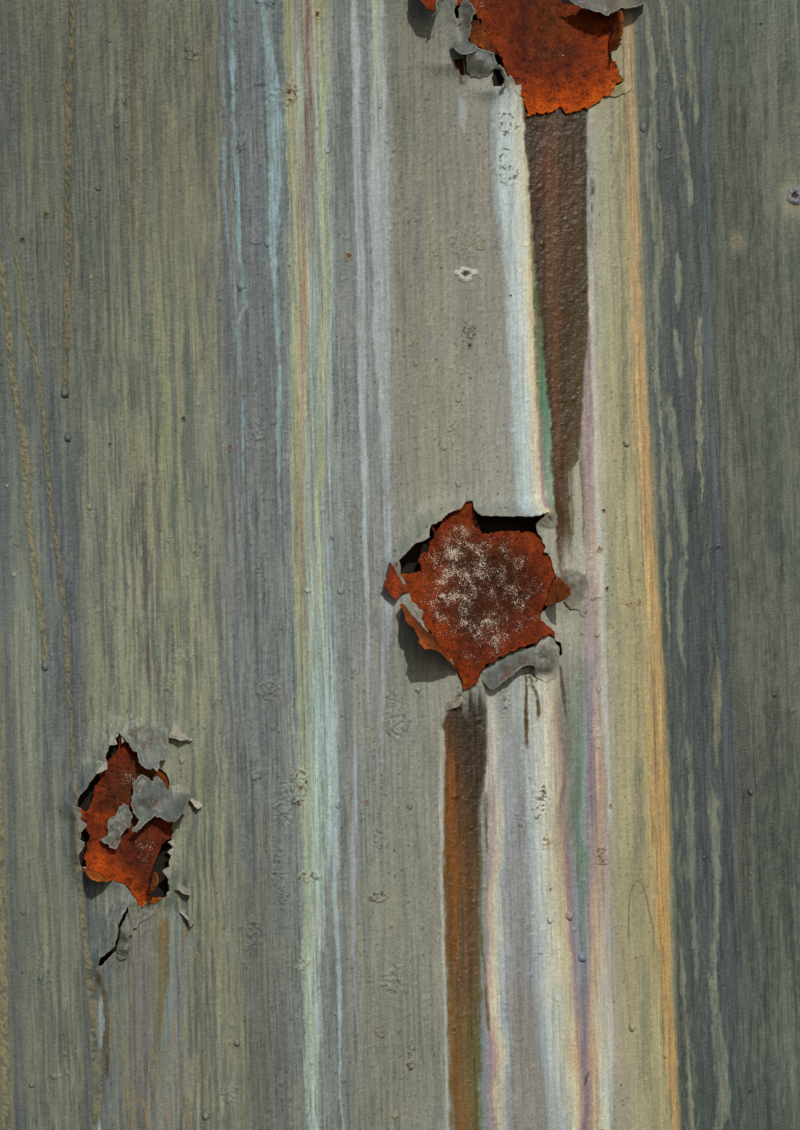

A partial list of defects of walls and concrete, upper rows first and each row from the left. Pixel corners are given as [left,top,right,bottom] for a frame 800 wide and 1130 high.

peeling [420,0,648,117]
rust [520,99,597,578]
peeling [384,500,590,712]
peeling [72,708,203,928]
rust [440,685,491,1130]